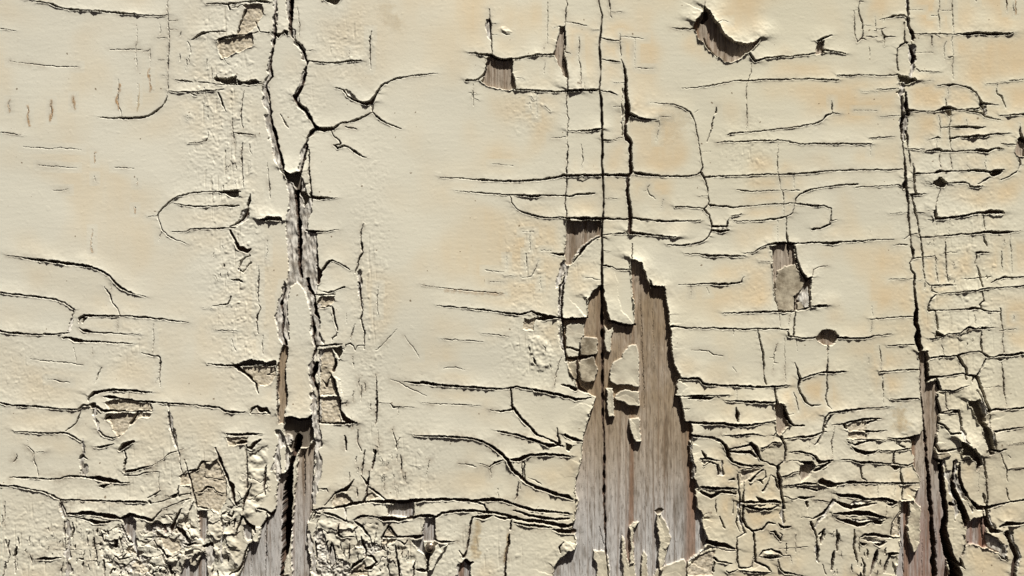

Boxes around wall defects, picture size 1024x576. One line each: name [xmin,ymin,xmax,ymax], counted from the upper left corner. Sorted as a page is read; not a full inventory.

peeling [464,25,566,91]
peeling [671,1,762,63]
crack [0,0,438,576]
peeling [207,358,279,395]
peeling [228,133,739,576]
crack [342,0,1024,576]
peeling [743,239,895,311]
spalling [65,430,294,576]